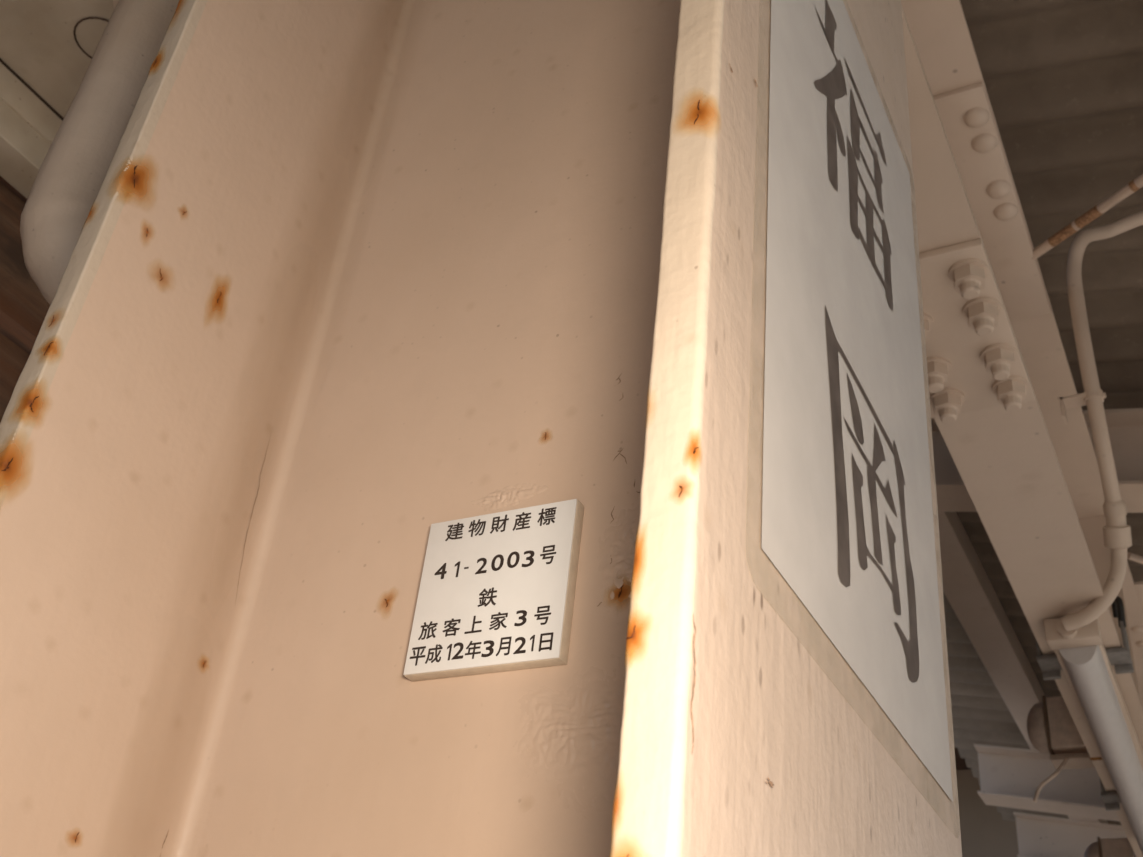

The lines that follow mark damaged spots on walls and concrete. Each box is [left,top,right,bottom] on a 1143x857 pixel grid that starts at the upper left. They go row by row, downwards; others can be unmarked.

rust [684,99,716,126]
rust [117,163,150,198]
rust [211,285,226,313]
rust [16,387,44,419]
rust [0,442,24,488]
rust [688,438,700,463]
rust [626,616,645,654]